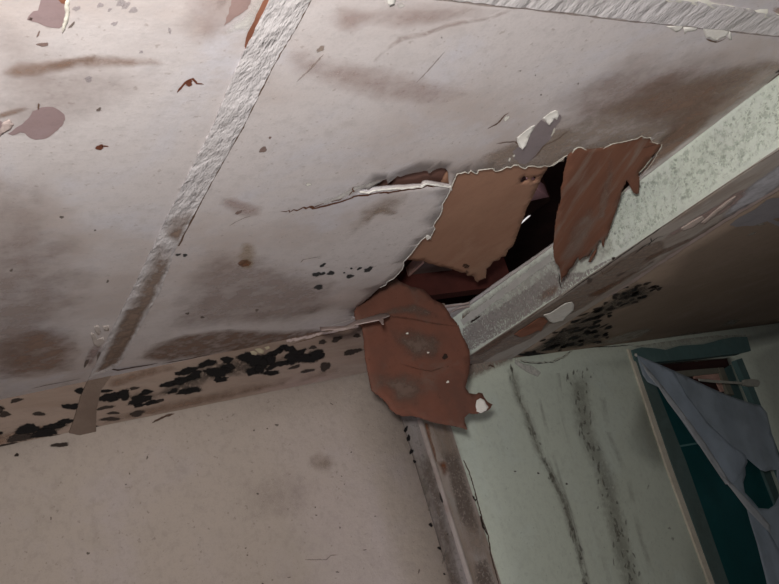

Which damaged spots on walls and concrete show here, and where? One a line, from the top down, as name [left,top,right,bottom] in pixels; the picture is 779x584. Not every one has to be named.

peeling [27,0,75,46]
peeling [224,0,269,48]
water stain [12,59,99,74]
peeling [0,103,65,140]
peeling [498,110,567,164]
water stain [493,65,779,168]
crack [281,183,452,213]
peeling [476,302,574,355]
water stain [463,241,665,377]
water stain [0,388,84,456]
water stain [96,331,342,427]
peeling [476,398,488,413]